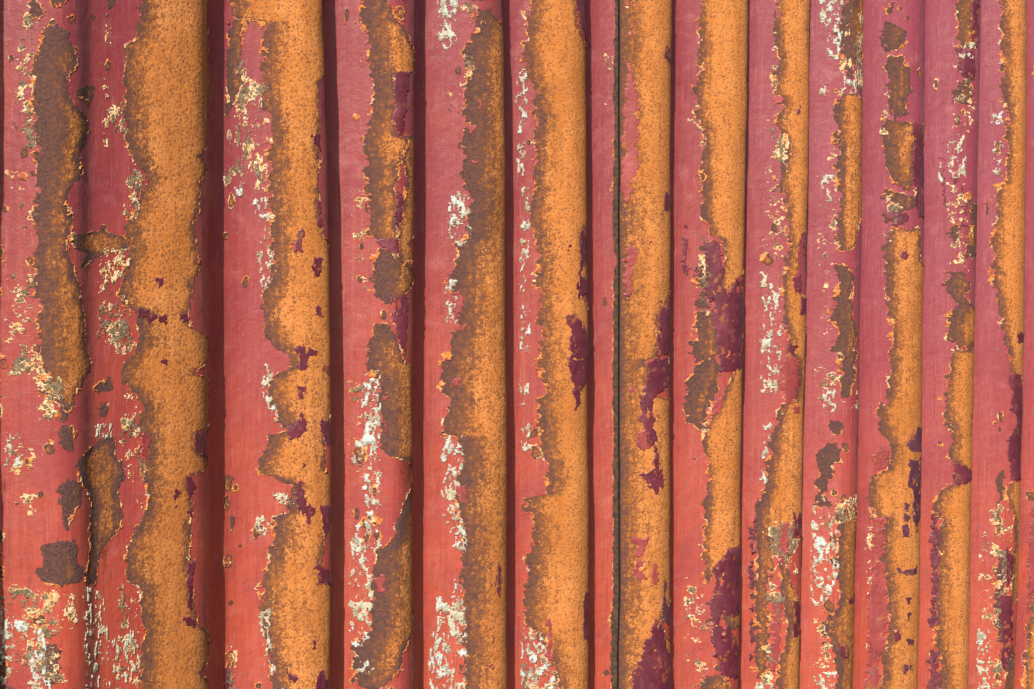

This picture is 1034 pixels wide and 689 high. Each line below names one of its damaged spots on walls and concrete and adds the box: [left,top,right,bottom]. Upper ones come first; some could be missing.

peeling [0,581,142,689]
corrosion [18,0,210,689]
peeling [95,393,150,487]
corrosion [222,0,332,689]
peeling [347,370,382,648]
corrosion [343,0,415,689]
corrosion [436,0,589,689]
corrosion [602,0,748,689]
peeling [762,494,875,689]
peeling [819,0,863,95]
corrosion [706,0,976,689]
peeling [938,42,976,272]